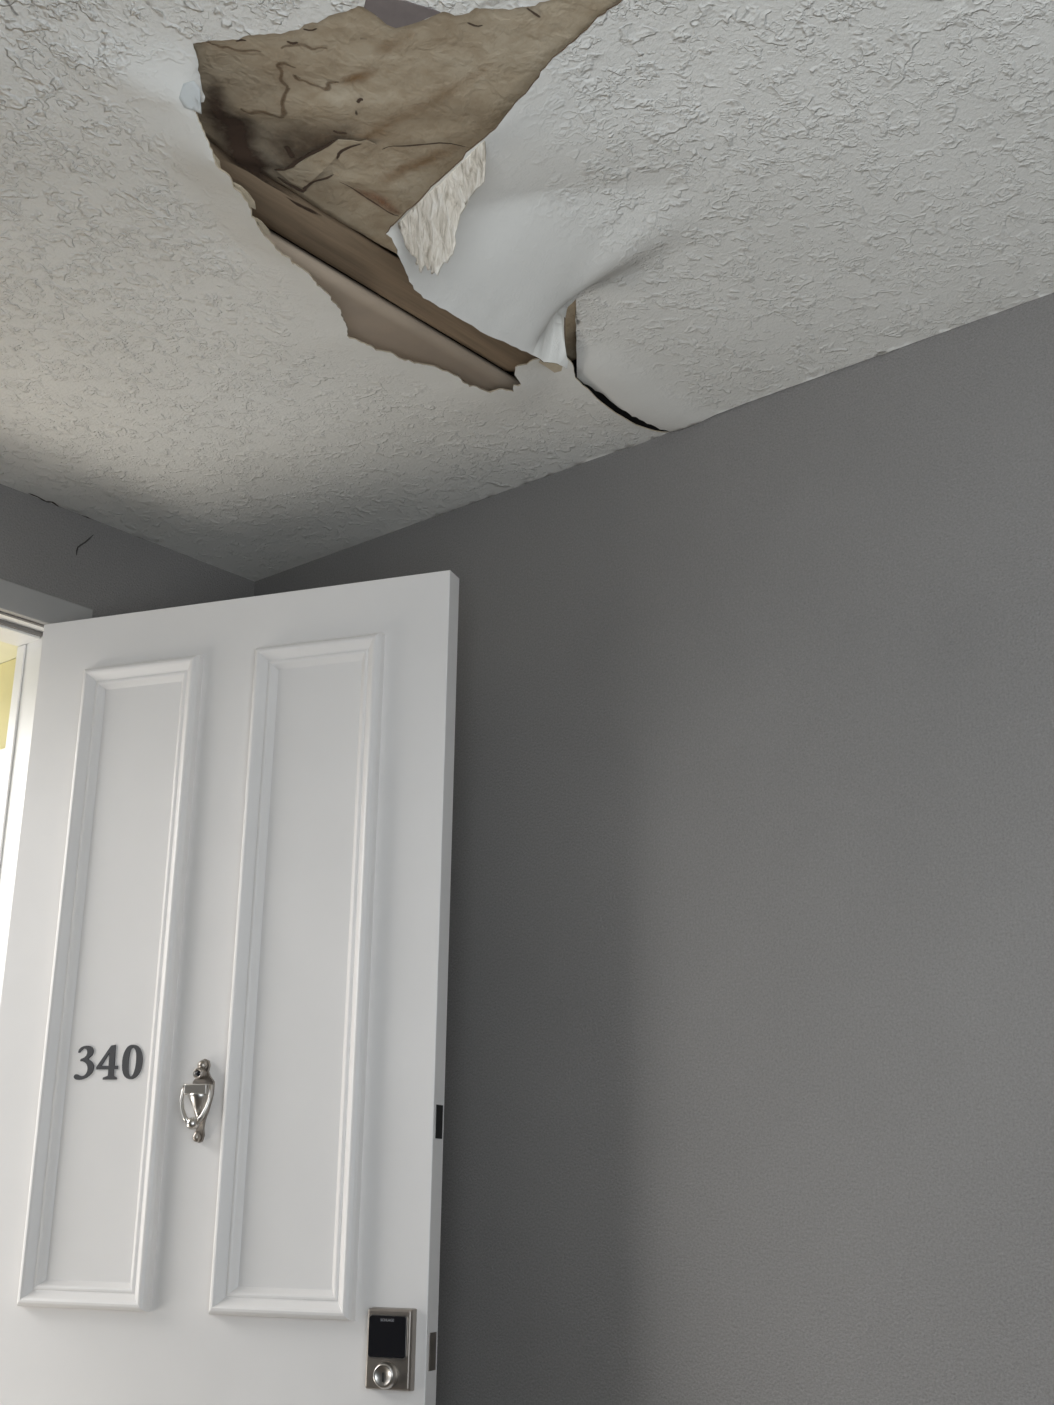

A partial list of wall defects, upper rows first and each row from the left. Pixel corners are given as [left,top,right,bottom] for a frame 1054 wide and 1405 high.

peeling [364,0,441,28]
peeling [539,360,563,373]
crack [574,367,664,431]